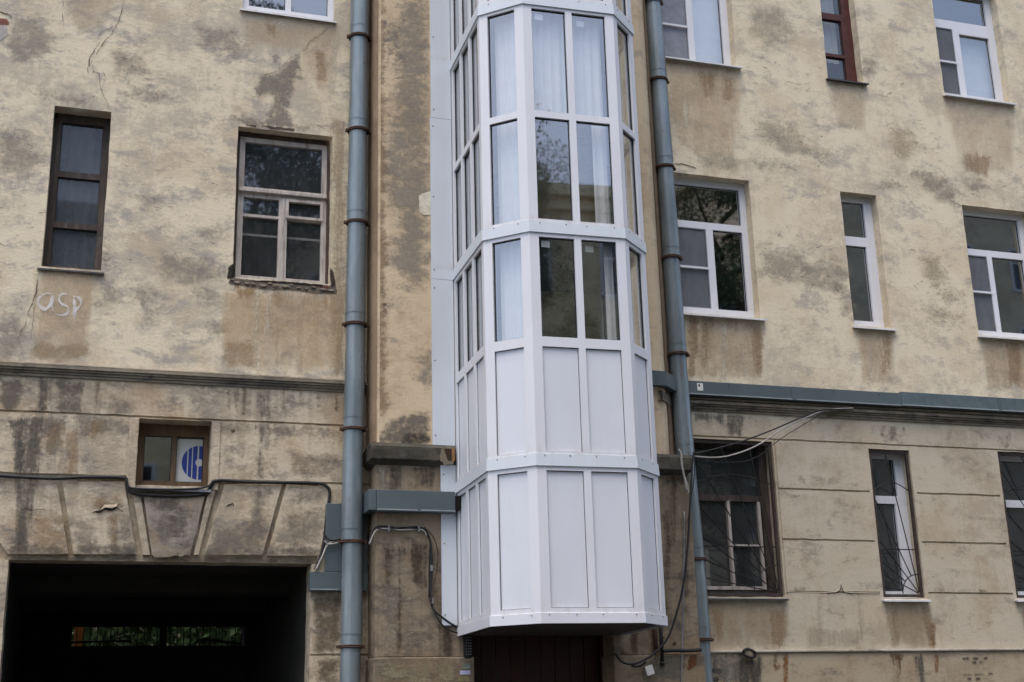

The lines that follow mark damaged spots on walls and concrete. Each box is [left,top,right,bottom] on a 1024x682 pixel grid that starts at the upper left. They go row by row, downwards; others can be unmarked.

crack [87,0,124,101]
leakage [379,2,431,444]
leakage [11,379,63,550]
spalling [92,503,123,513]